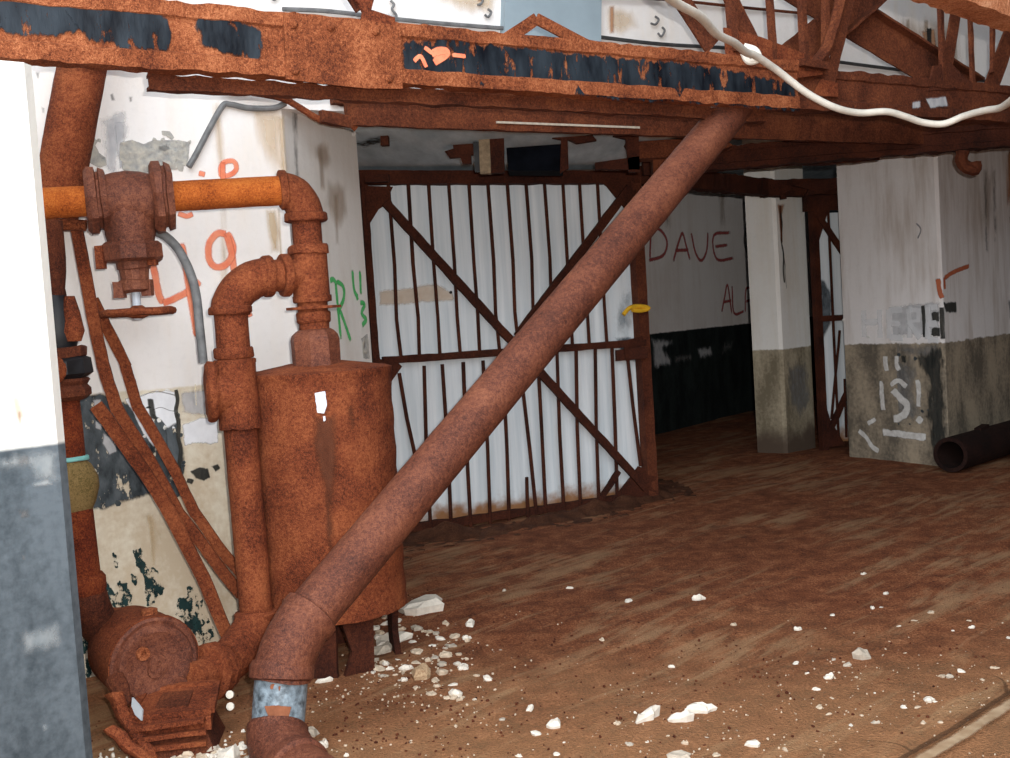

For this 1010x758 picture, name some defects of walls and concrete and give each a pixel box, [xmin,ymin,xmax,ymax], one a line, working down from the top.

rust [318,110,353,128]
spalling [90,138,107,167]
spalling [119,131,191,173]
peeling [80,394,150,509]
peeling [122,389,220,497]
peeling [106,548,165,607]
peeling [176,586,215,644]